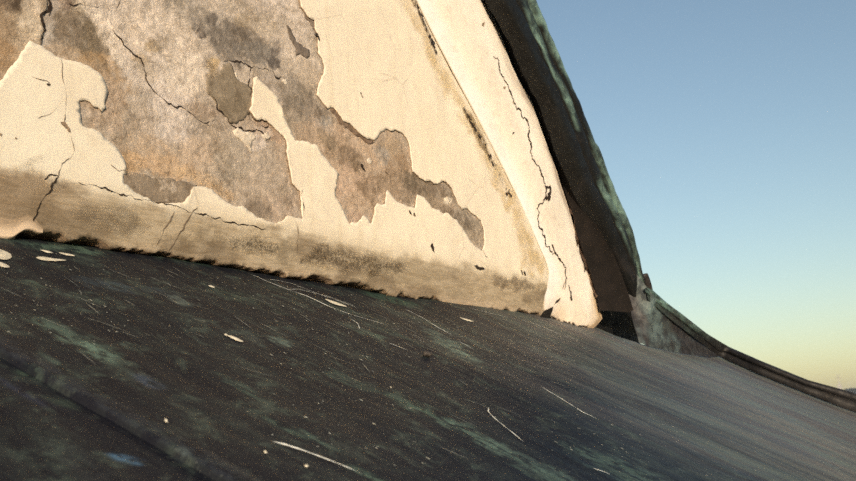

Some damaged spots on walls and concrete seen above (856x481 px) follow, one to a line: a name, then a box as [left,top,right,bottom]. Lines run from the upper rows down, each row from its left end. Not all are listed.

crack [33,114,74,222]
crack [40,0,269,142]
crack [79,165,263,250]
peeling [0,0,484,250]
crack [227,60,281,89]
spalling [463,107,512,198]
crack [493,56,572,301]